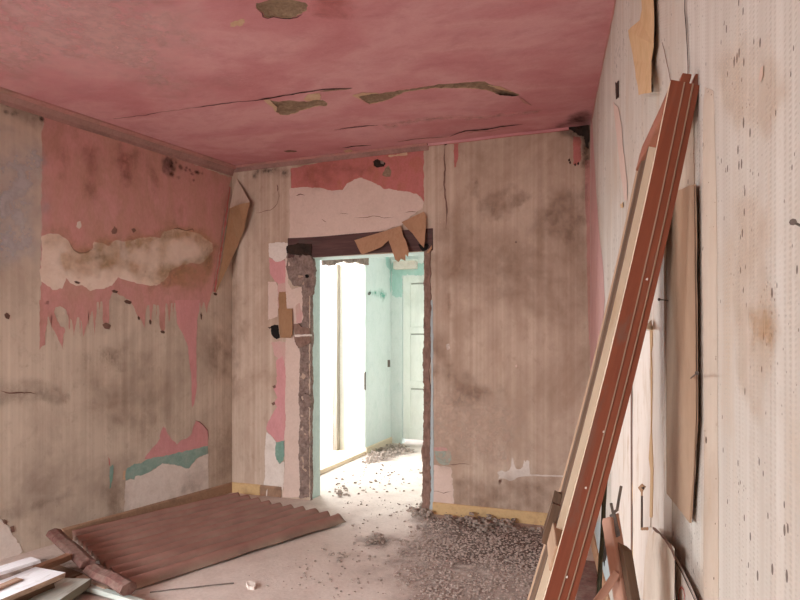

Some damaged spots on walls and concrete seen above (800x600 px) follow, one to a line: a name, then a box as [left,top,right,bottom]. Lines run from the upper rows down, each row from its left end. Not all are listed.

spalling [256,0,308,19]
crack [115,88,349,119]
spalling [264,93,327,115]
spalling [352,81,531,105]
crack [339,125,374,153]
damp [569,116,590,154]
crack [399,124,521,224]
peeling [39,117,232,407]
flaking render [264,151,424,500]
flaking render [421,249,465,509]
flaking render [108,421,209,512]